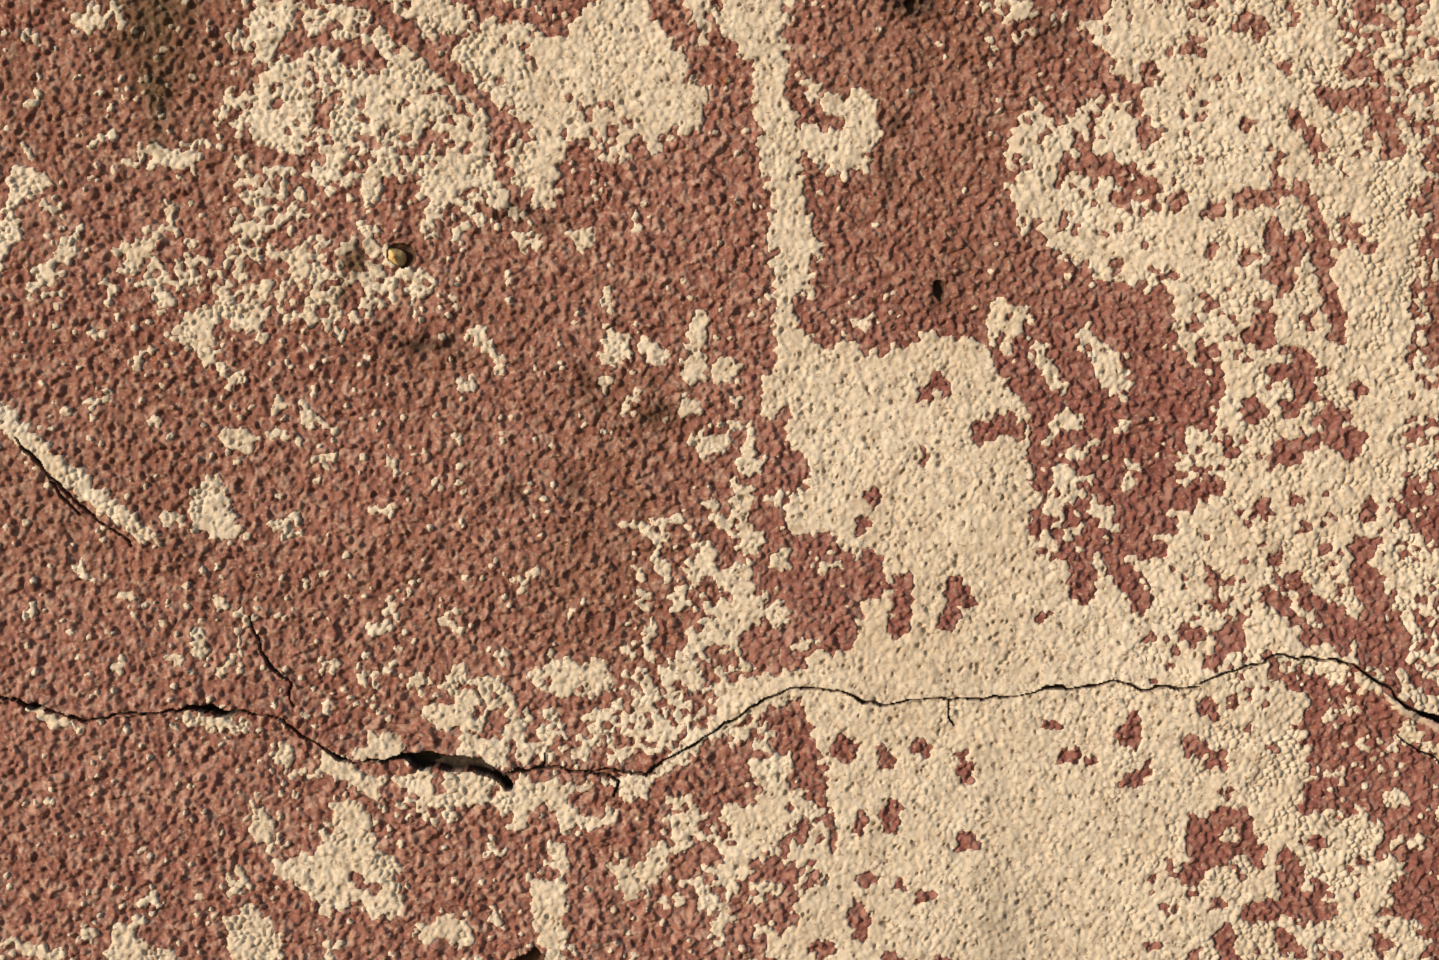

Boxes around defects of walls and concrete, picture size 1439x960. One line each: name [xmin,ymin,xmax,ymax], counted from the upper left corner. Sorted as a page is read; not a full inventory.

peeling [70,2,113,36]
peeling [98,0,708,392]
peeling [217,426,263,456]
peeling [314,0,1439,960]
peeling [189,626,212,661]
peeling [182,710,264,747]
peeling [272,741,295,775]
crack [0,616,1439,798]
peeling [248,797,406,921]
peeling [221,864,287,960]